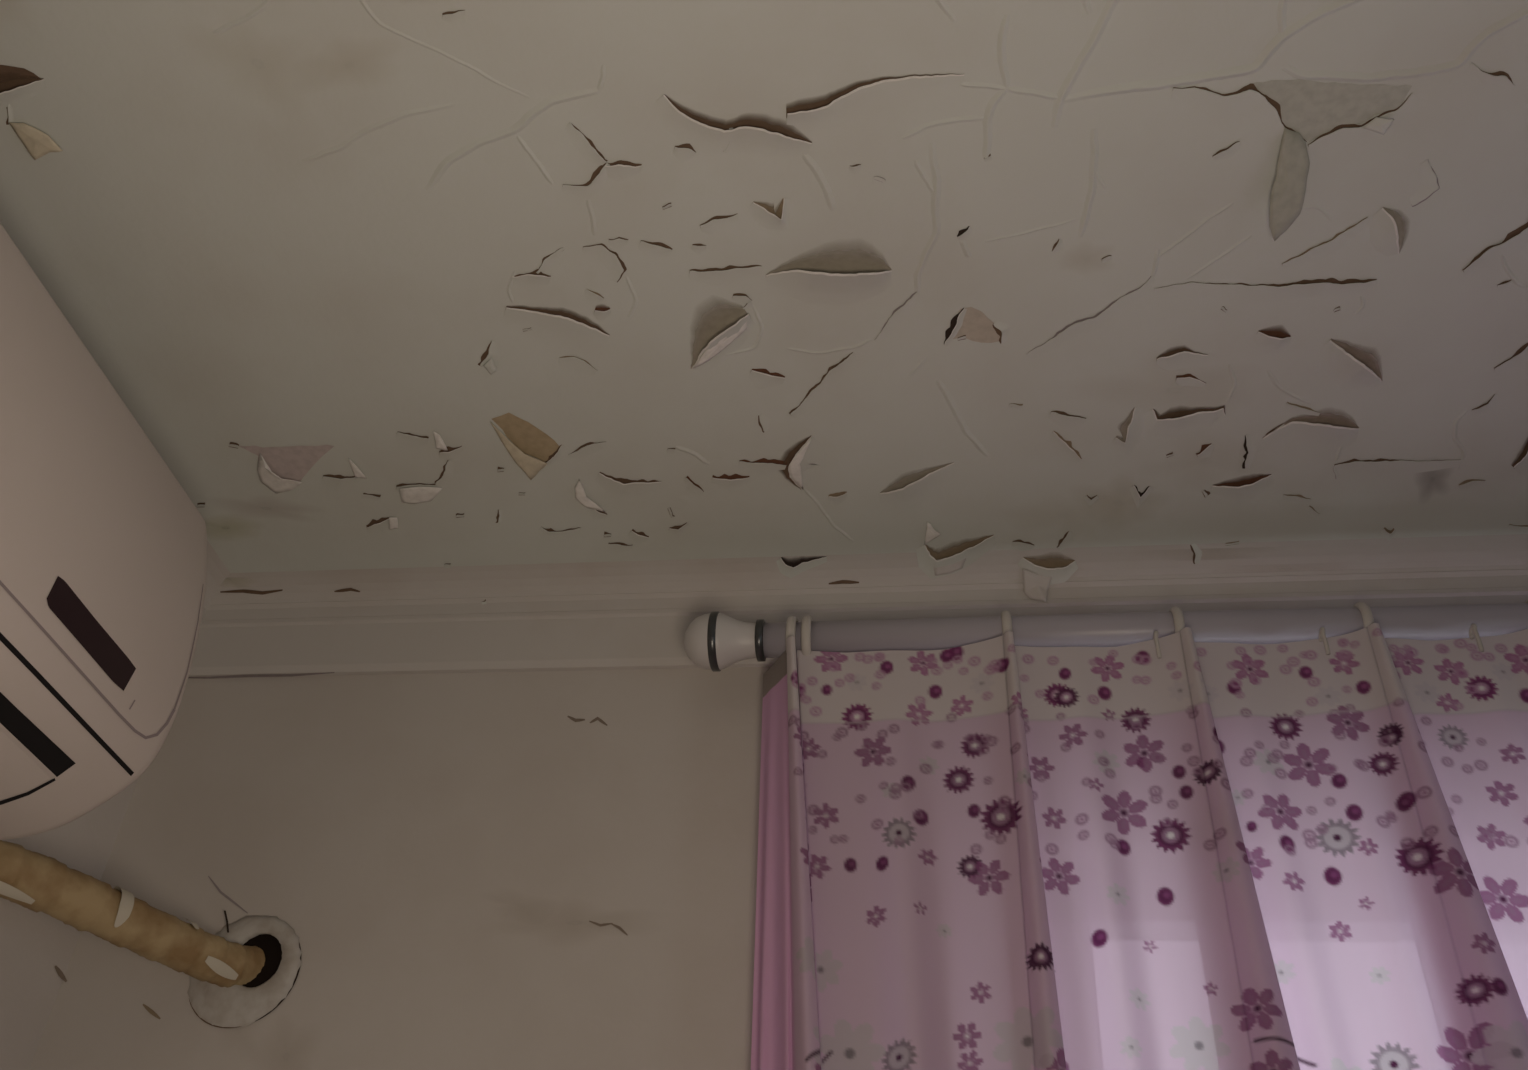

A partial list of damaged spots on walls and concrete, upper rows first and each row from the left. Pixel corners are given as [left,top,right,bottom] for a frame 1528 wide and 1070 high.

crack [442,10,466,23]
peeling [0,65,63,160]
peeling [1171,79,1419,241]
crack [1468,63,1515,90]
peeling [503,123,672,376]
peeling [688,198,892,373]
crack [758,142,941,433]
peeling [944,307,1011,346]
crack [1027,128,1377,359]
crack [1472,343,1528,415]
peeling [490,413,606,496]
peeling [916,521,1078,602]